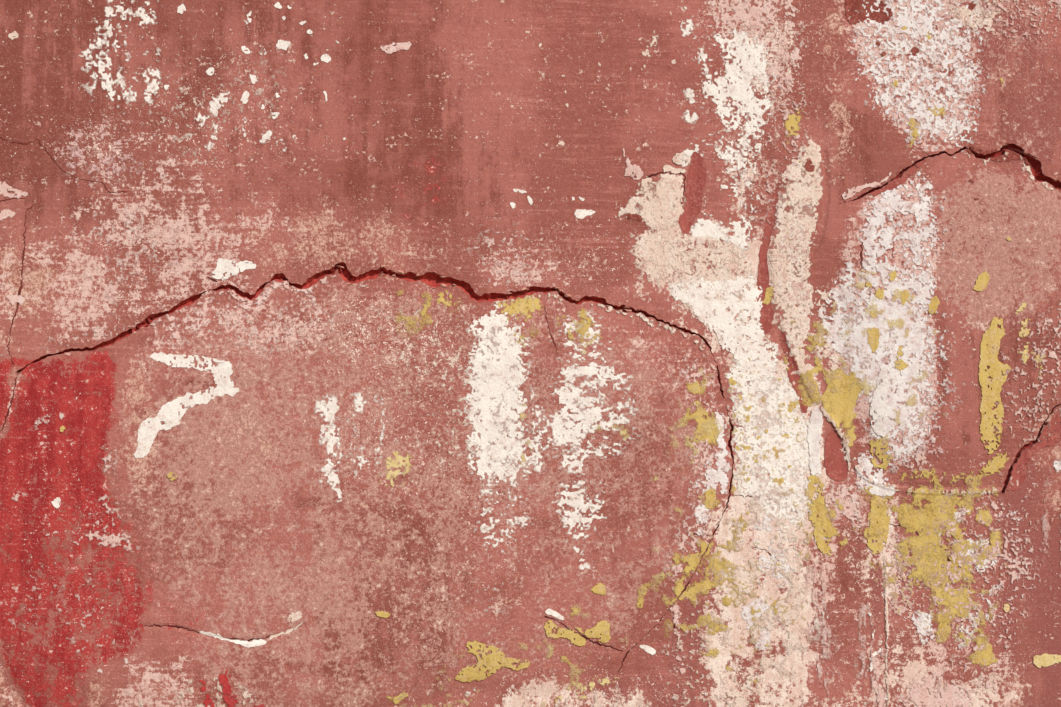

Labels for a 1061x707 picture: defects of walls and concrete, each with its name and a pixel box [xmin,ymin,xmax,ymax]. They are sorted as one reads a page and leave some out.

peeling [79,0,296,164]
crack [840,144,1061,204]
peeling [89,204,198,303]
crack [857,238,865,281]
peeling [47,258,343,458]
crack [0,197,809,560]
peeling [378,0,1061,707]
peeling [315,393,412,502]
crack [1002,404,1059,491]
crack [143,624,200,633]
crack [226,624,302,642]
peeling [175,671,225,707]